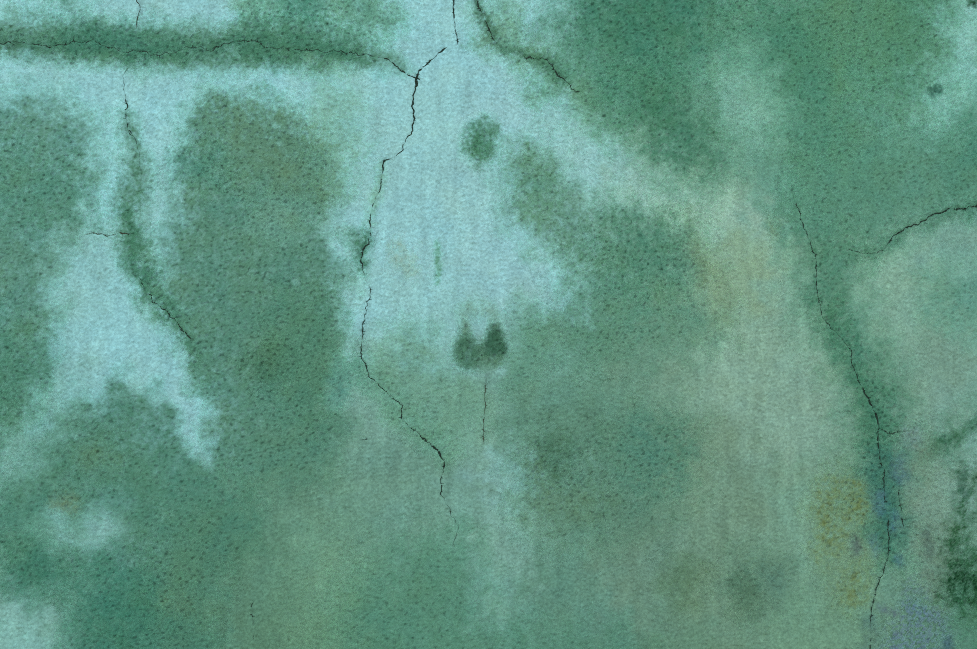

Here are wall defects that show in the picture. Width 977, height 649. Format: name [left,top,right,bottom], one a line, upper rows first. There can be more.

crack [0,0,494,544]
crack [524,56,579,92]
crack [793,195,904,649]
crack [849,205,977,254]